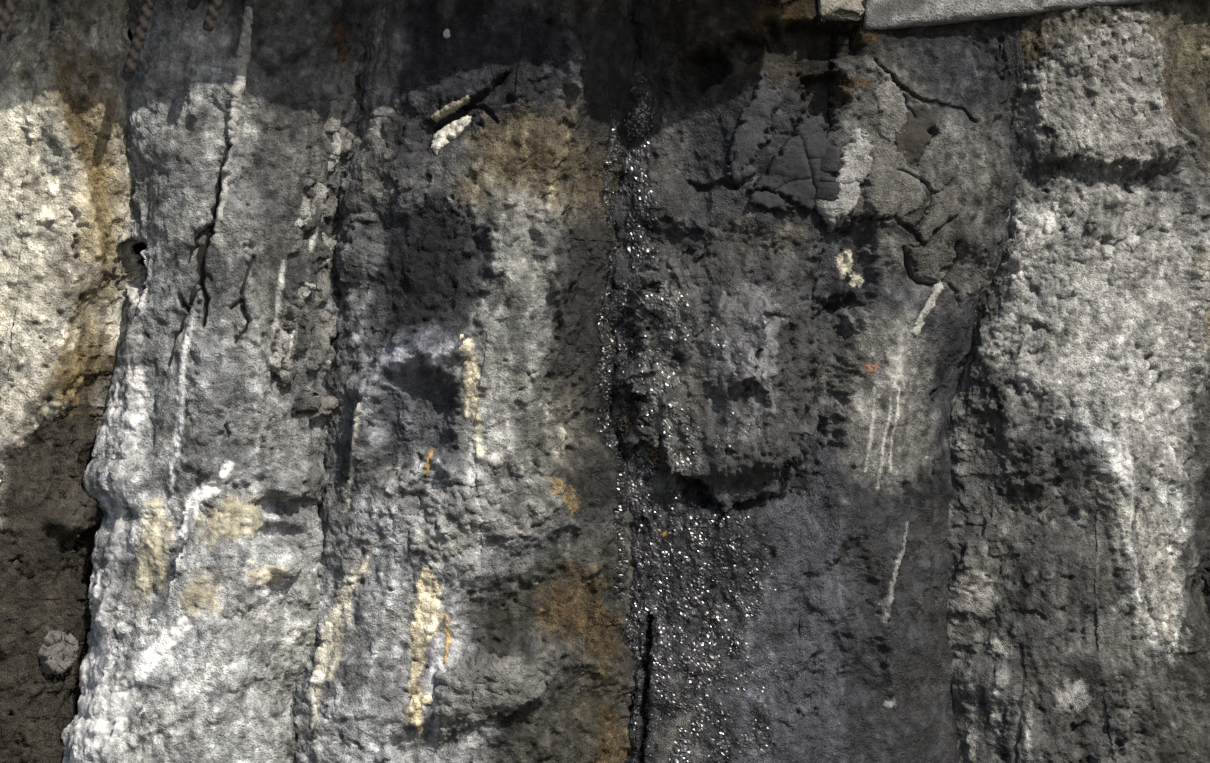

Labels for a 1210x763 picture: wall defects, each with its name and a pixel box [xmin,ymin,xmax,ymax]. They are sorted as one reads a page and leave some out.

corrosion [54,54,116,260]
crack [170,141,254,365]
flaking render [726,67,962,337]
crack [839,179,959,308]
crack [874,60,975,122]
corrosion [47,344,102,405]
leakage [596,73,857,763]